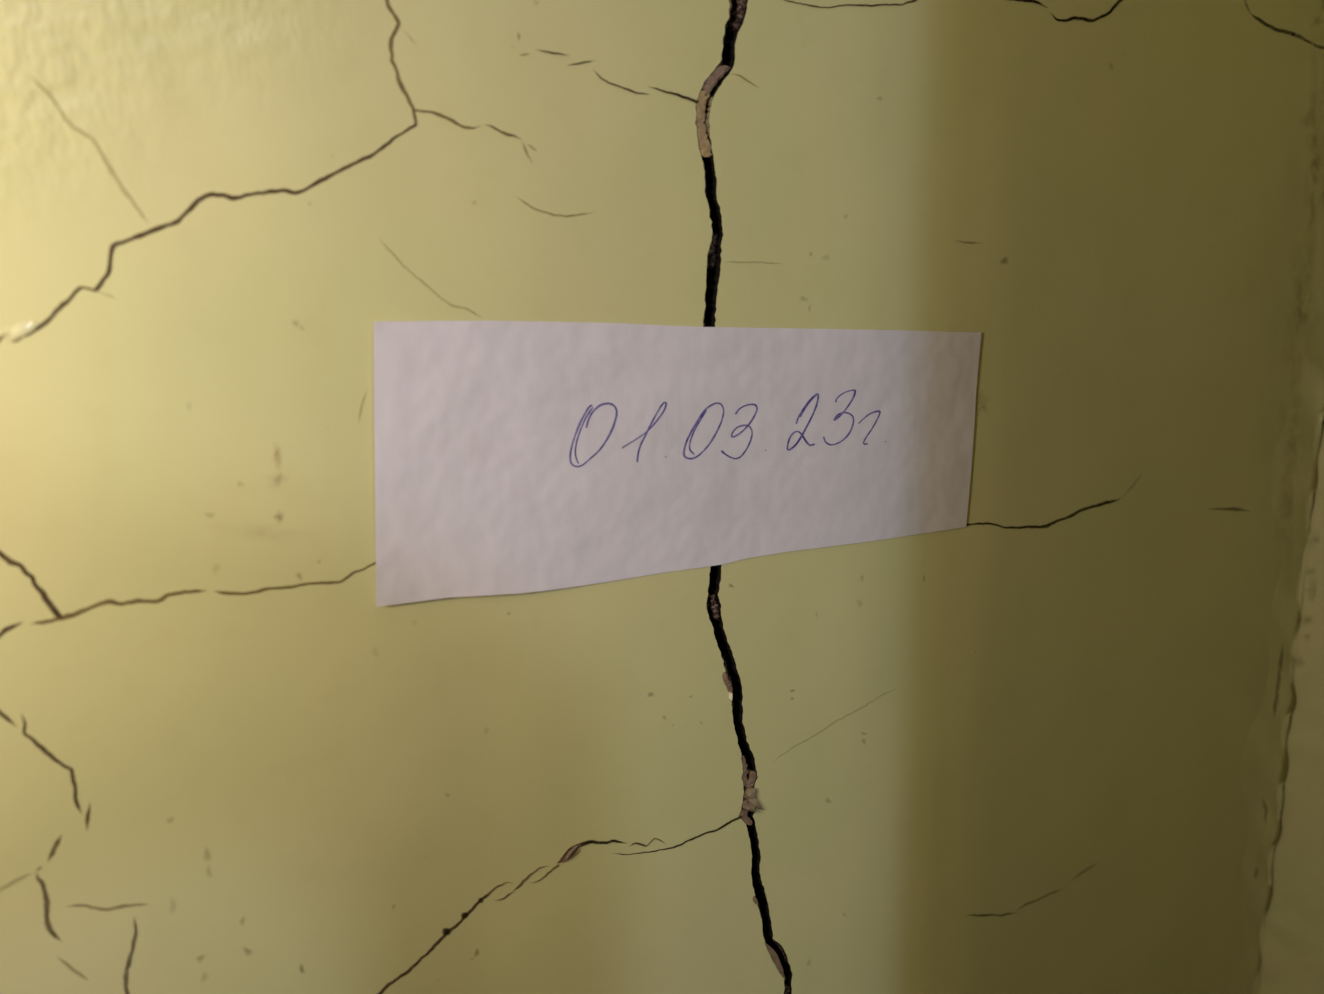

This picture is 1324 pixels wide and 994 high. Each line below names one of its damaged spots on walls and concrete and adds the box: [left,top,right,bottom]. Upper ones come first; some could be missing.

crack [785,0,917,8]
crack [1015,0,1122,22]
crack [1253,15,1324,49]
crack [0,0,528,342]
crack [521,0,756,327]
crack [0,551,376,636]
crack [378,565,792,994]
crack [0,712,90,939]
crack [124,922,137,994]